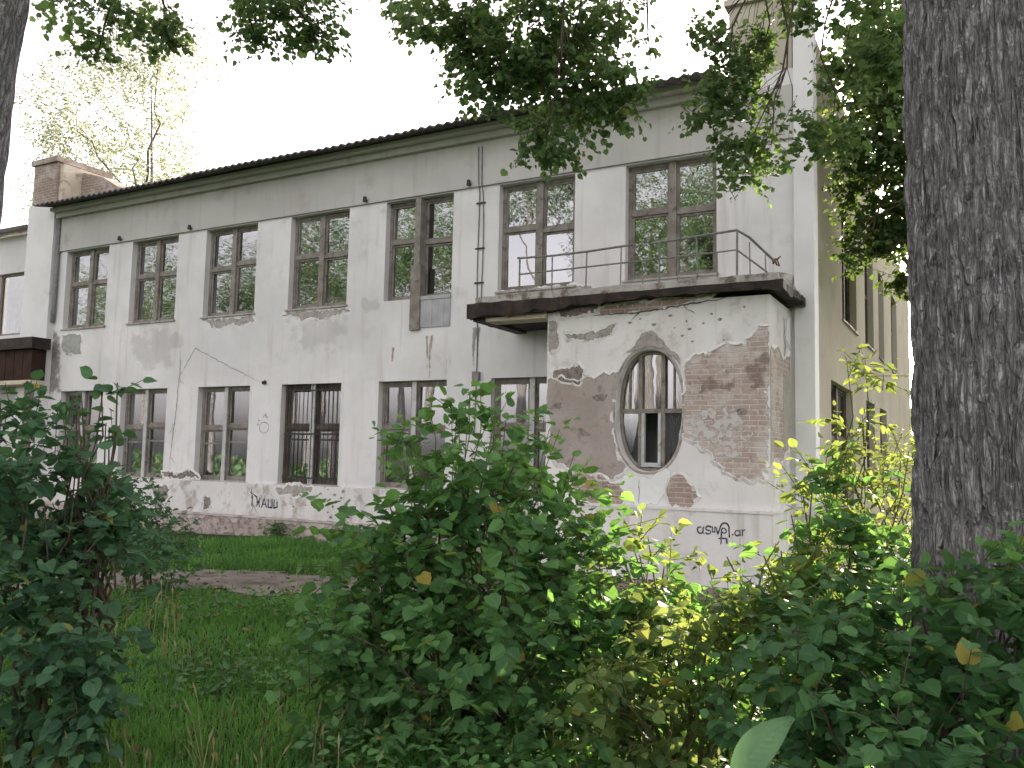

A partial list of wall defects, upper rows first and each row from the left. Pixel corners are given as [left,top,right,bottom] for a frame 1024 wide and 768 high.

flaking render [201,313,256,331]
flaking render [281,306,352,323]
crack [170,348,268,465]
flaking render [547,293,791,508]
flaking render [150,468,356,545]